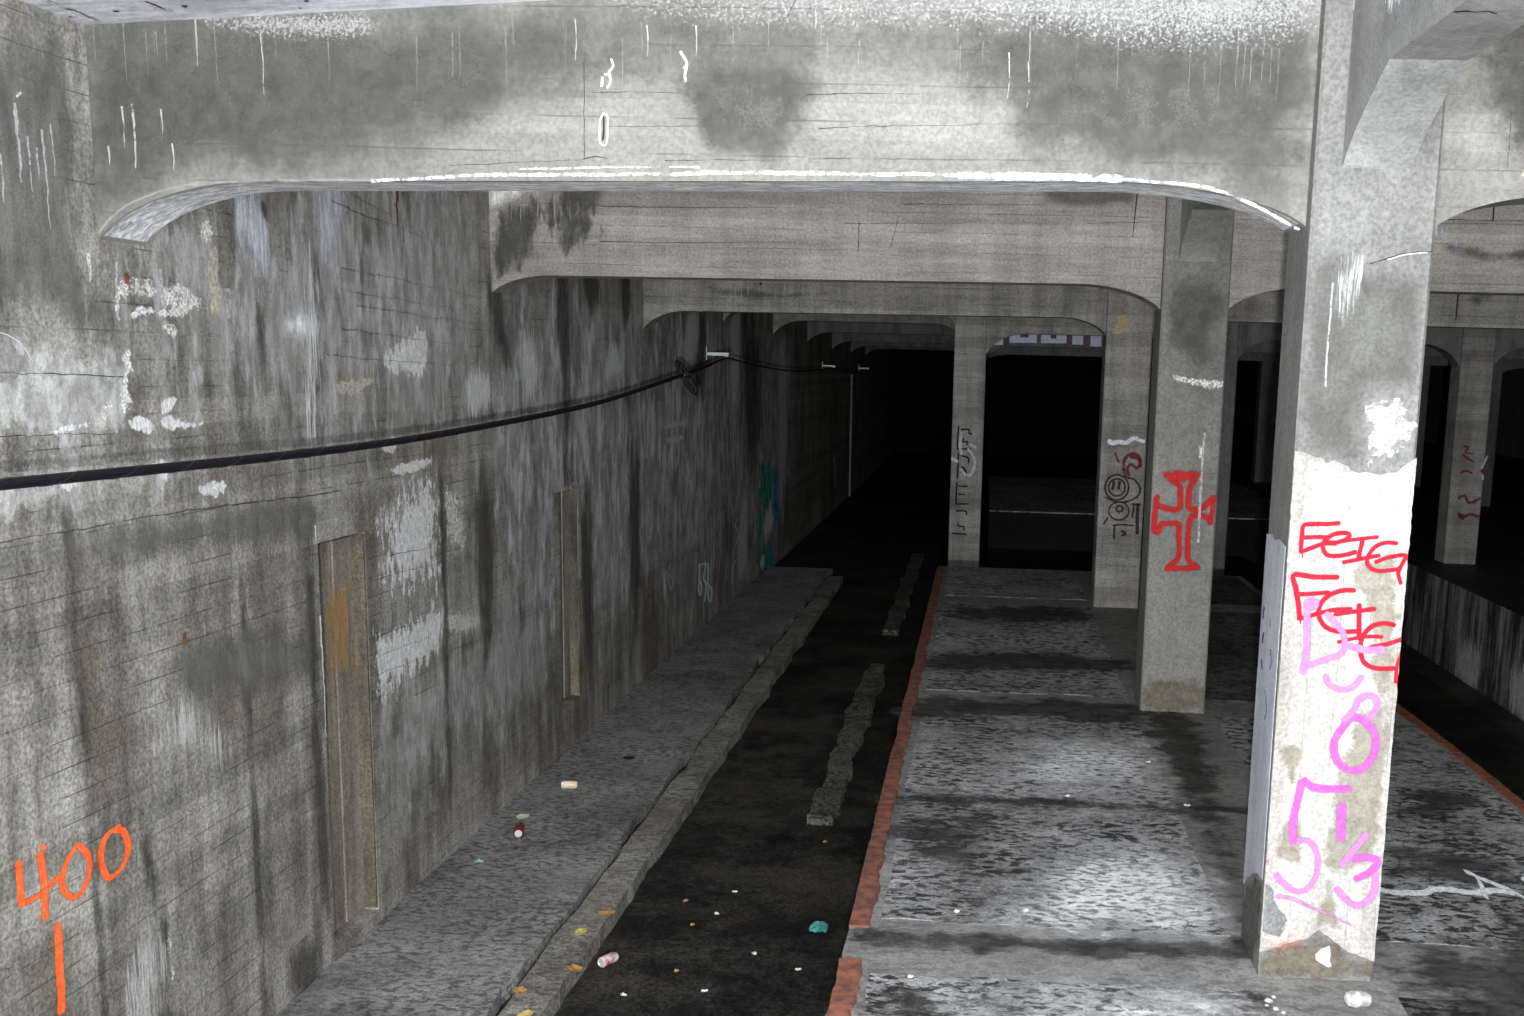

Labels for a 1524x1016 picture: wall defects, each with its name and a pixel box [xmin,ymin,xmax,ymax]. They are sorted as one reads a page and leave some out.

leakage [0,33,93,318]
leakage [101,350,133,434]
leakage [112,217,231,338]
leakage [234,194,270,275]
leakage [285,190,343,481]
leakage [86,12,586,187]
leakage [462,190,804,678]
leakage [612,10,817,153]
leakage [929,7,1299,169]
leakage [1310,257,1417,466]
leakage [1490,25,1524,135]
leakage [109,504,329,919]